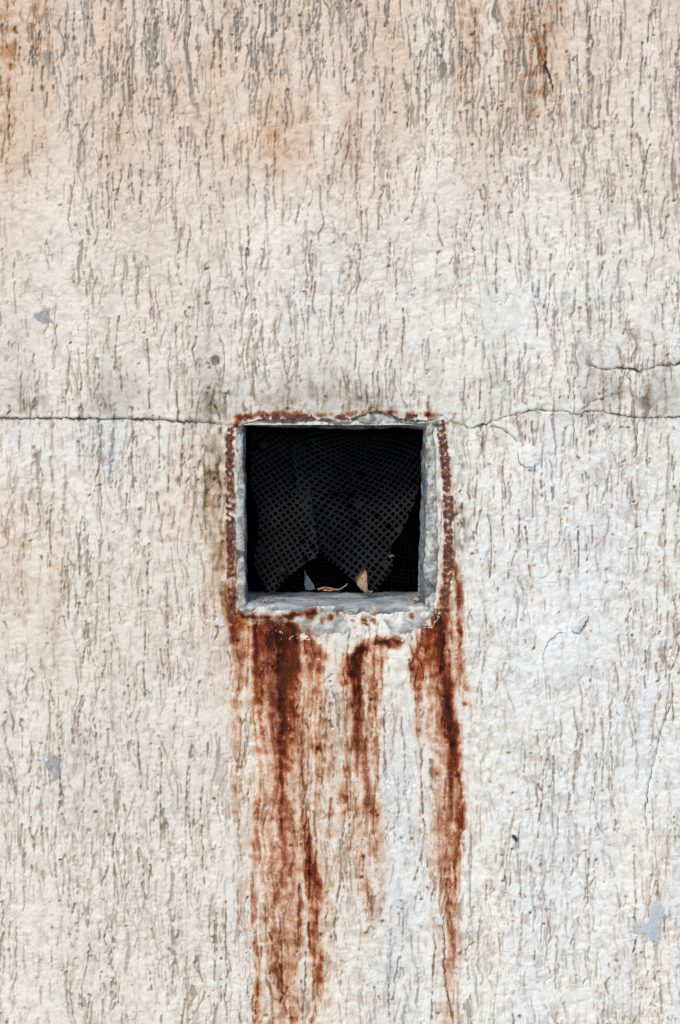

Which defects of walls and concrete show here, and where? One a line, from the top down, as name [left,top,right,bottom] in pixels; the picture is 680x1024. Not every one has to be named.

peeling [31,308,52,323]
rust [234,411,297,428]
crack [0,361,680,455]
peeling [45,755,62,780]
rust [230,591,338,1020]
rust [344,618,402,816]
rust [409,569,464,906]
peeling [630,900,669,942]